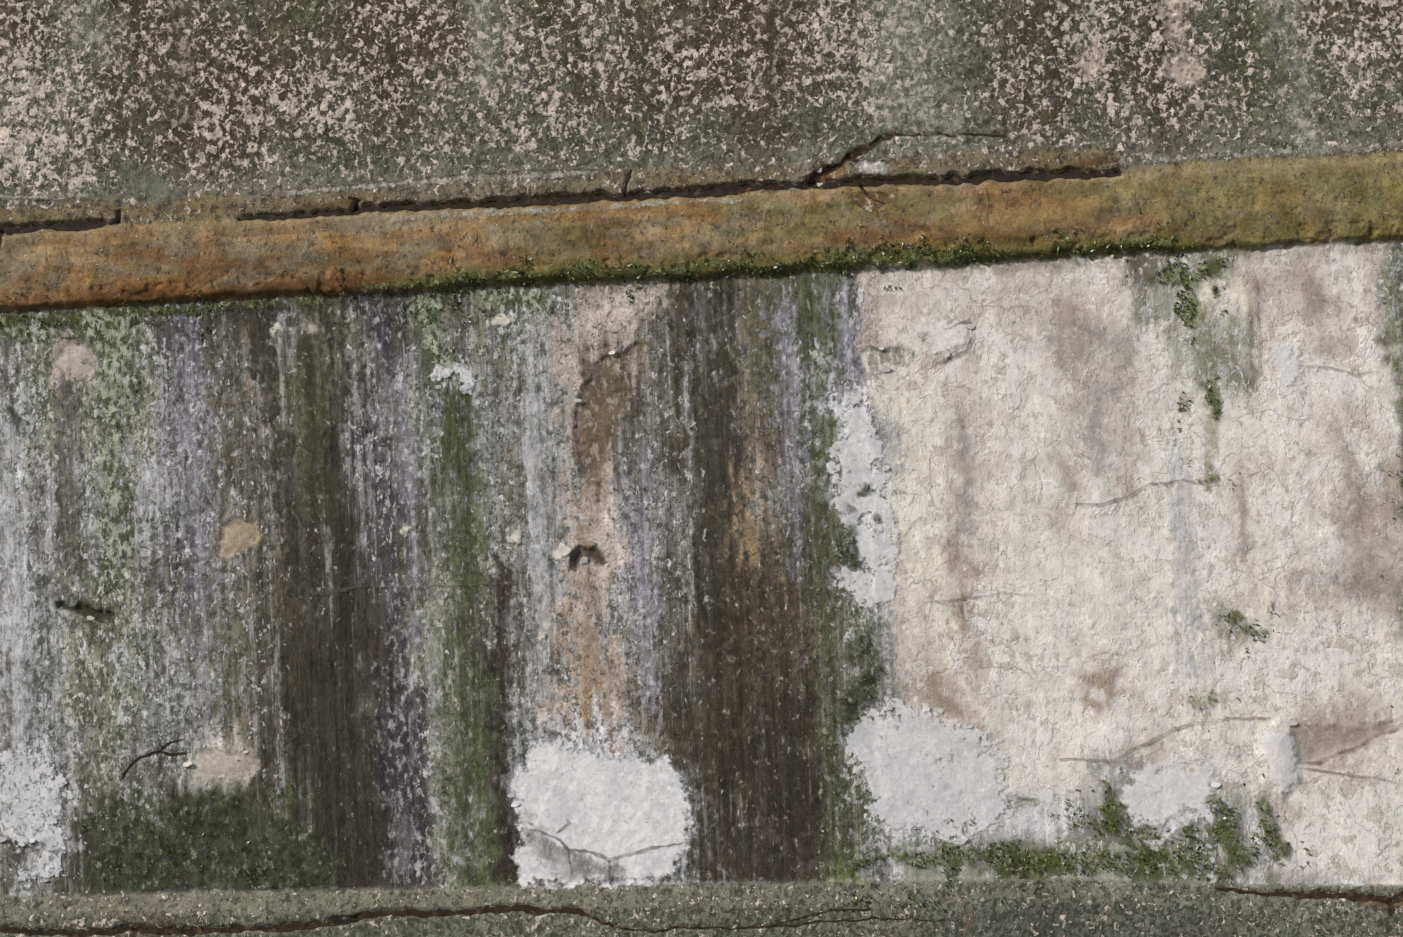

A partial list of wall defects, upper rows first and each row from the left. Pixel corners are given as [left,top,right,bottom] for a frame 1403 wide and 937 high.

crack [0,198,121,244]
crack [237,132,1122,229]
water stain [0,495,30,760]
spalling [57,600,116,623]
water stain [237,291,458,887]
water stain [490,316,623,883]
spalling [552,543,605,569]
water stain [638,281,823,881]
peeling [507,739,695,890]
peeling [845,694,1039,846]
crack [0,905,945,937]
crack [1215,887,1403,916]